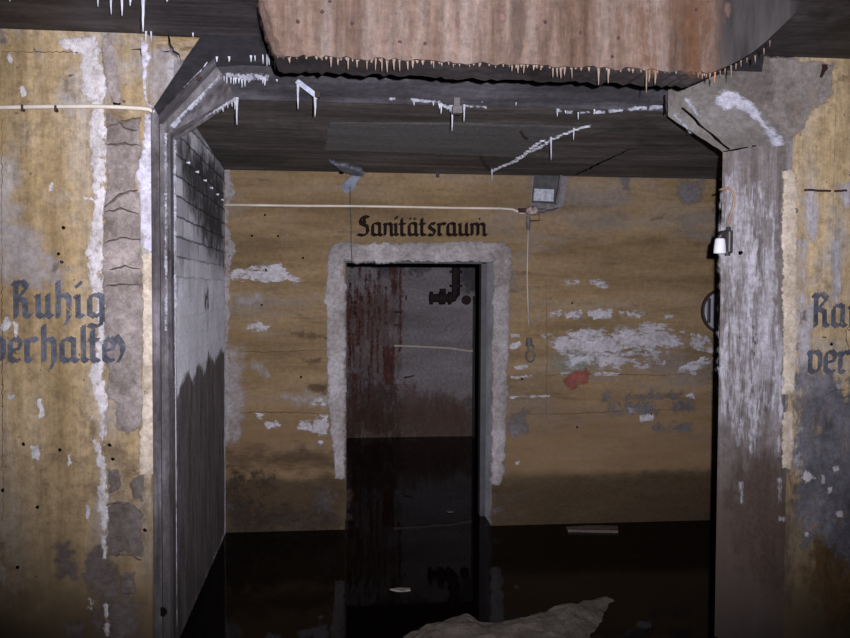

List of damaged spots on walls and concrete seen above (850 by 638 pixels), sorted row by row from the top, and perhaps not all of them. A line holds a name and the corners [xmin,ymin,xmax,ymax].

rust [508,0,524,62]
crack [106,117,141,146]
crack [663,95,756,152]
leakage [716,57,784,147]
crack [104,190,139,215]
crack [106,264,141,287]
leakage [164,73,347,638]
rust [347,264,407,405]
peeling [541,308,719,375]
leakage [718,173,850,571]
leakage [493,475,716,525]